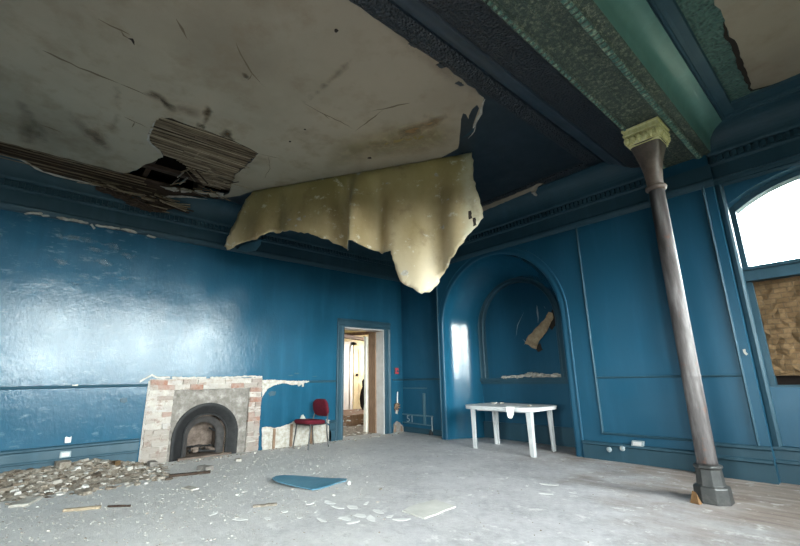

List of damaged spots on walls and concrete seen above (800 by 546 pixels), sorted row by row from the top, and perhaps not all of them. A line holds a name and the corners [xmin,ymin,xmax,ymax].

peeling [714,0,800,91]
peeling [0,0,543,294]
peeling [262,415,331,450]